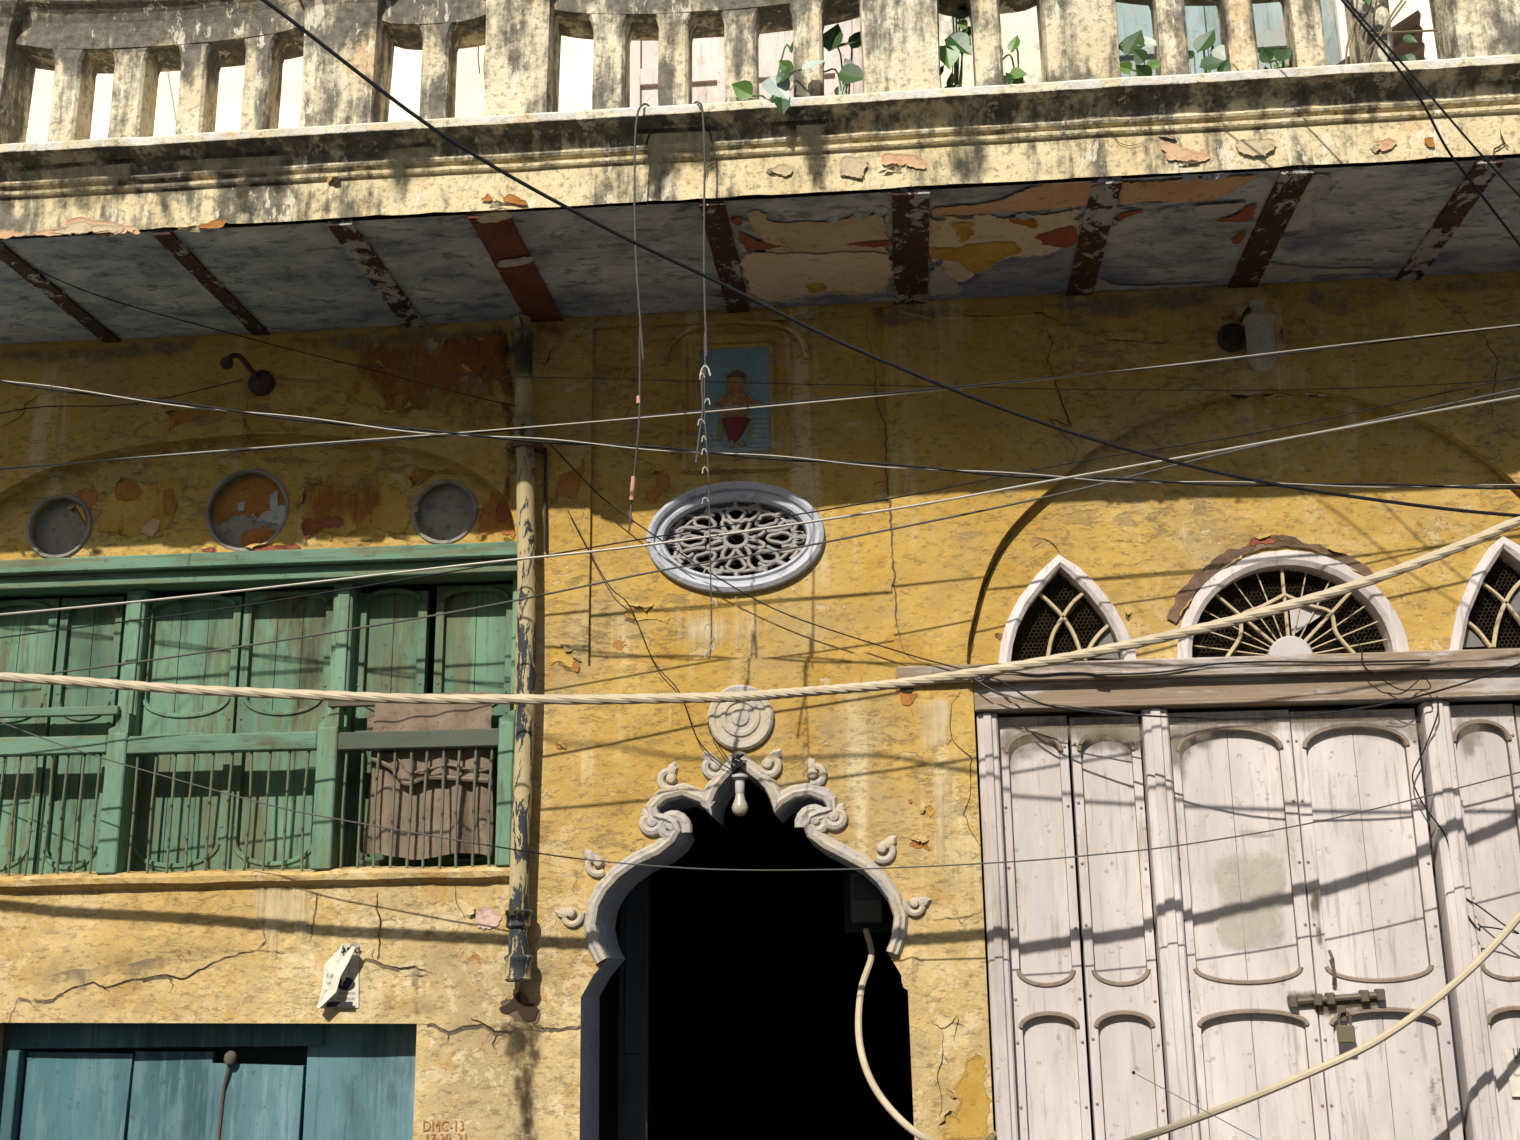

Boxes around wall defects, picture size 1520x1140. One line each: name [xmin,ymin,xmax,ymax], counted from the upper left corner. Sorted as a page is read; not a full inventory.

spalling [0,216,140,239]
water stain [236,183,250,213]
peeling [730,206,894,303]
spalling [839,153,926,178]
peeling [928,135,1257,296]
spalling [1234,137,1276,156]
peeling [210,468,458,551]
peeling [461,491,516,542]
crack [0,893,321,1024]
water stain [502,1024,539,1140]
peeling [939,1053,996,1140]